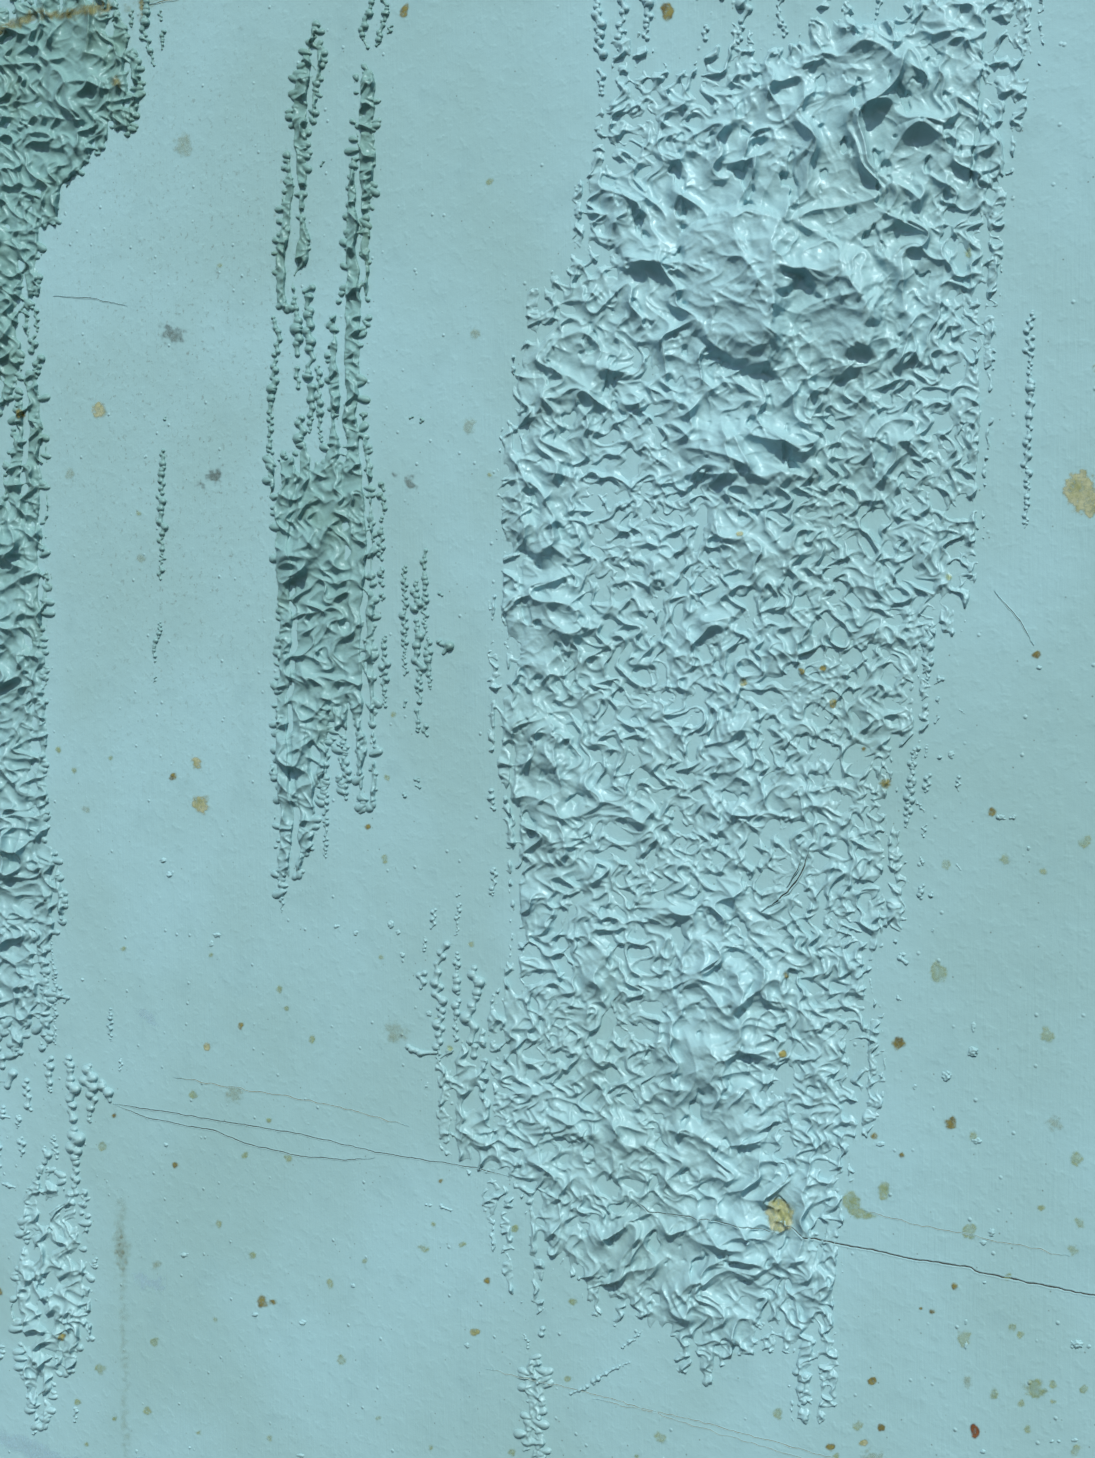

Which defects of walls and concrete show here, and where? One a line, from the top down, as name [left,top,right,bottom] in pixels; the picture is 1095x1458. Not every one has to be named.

leakage [1063,469,1095,518]
crack [114,1077,510,1177]
crack [633,1199,1095,1298]